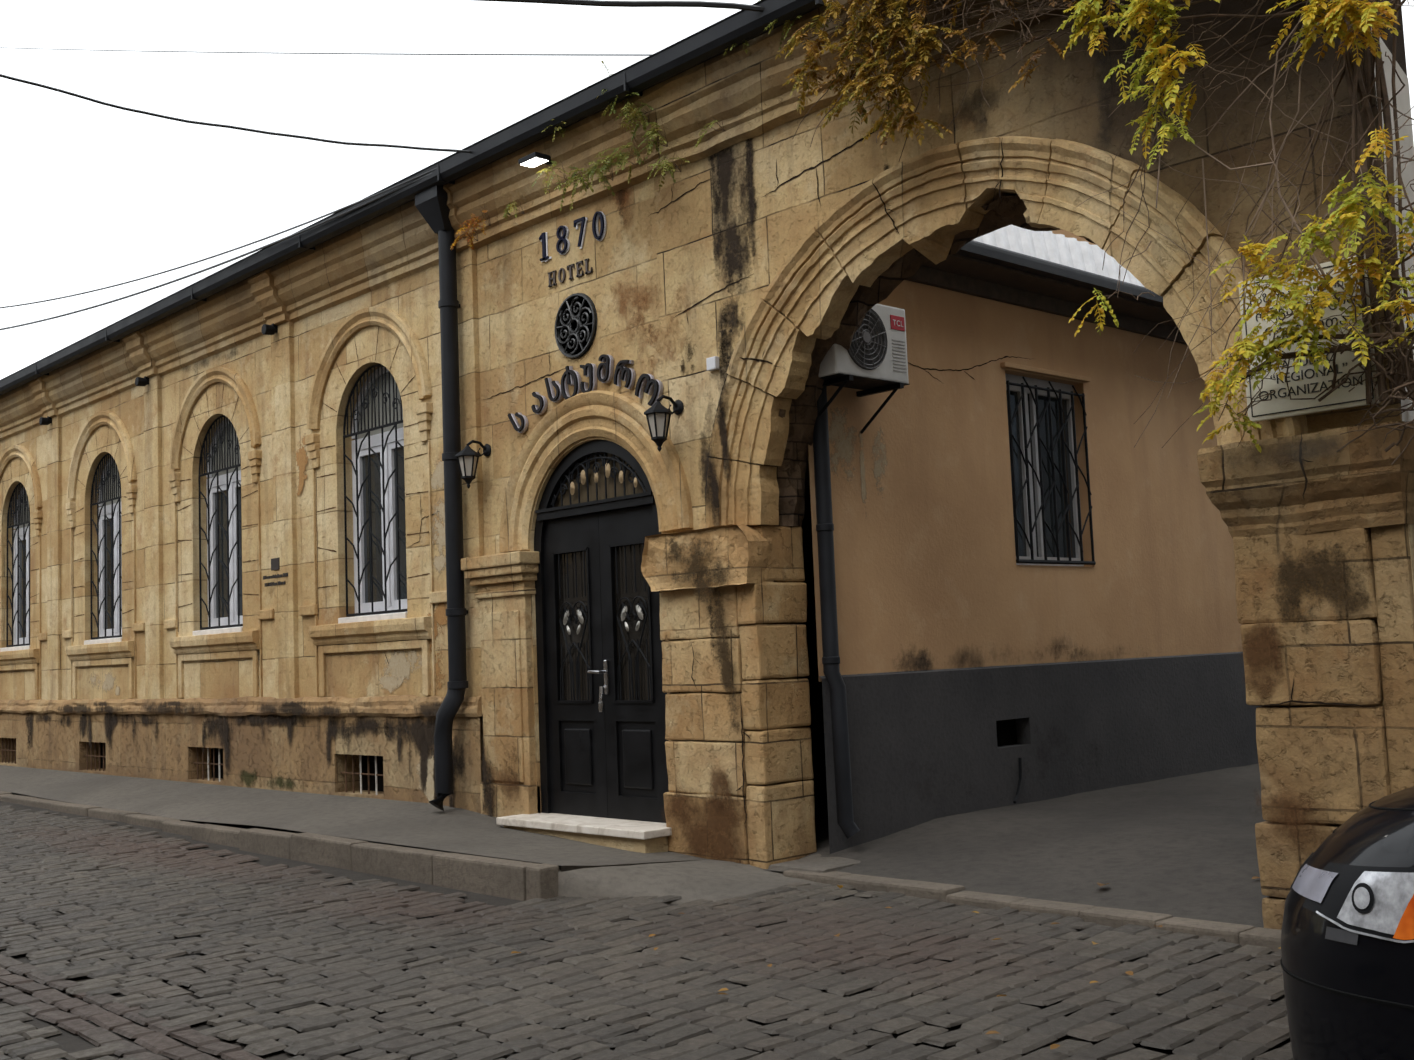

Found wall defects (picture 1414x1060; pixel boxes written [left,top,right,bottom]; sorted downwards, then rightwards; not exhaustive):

damp [700,138,756,525]
damp [1276,544,1369,625]
damp [708,587,739,728]
damp [25,701,464,808]
damp [482,741,519,817]
damp [666,770,741,863]